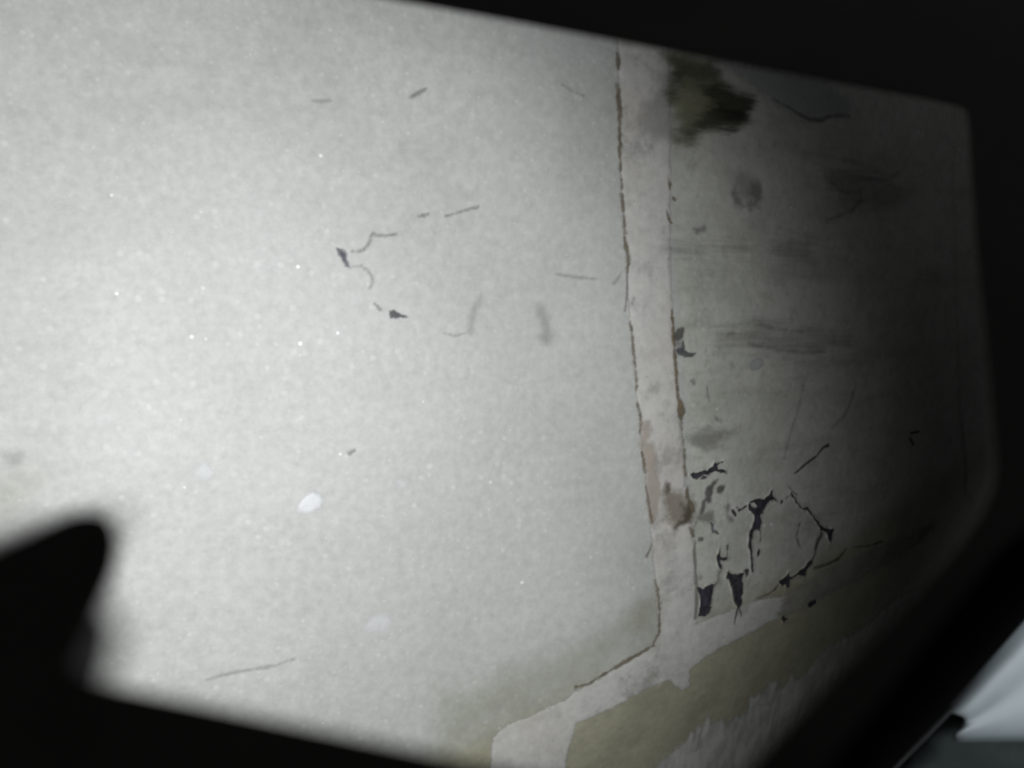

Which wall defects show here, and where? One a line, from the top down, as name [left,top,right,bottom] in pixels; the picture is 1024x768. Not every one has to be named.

water stain [668,54,755,143]
peeling [687,458,729,482]
peeling [695,487,779,623]